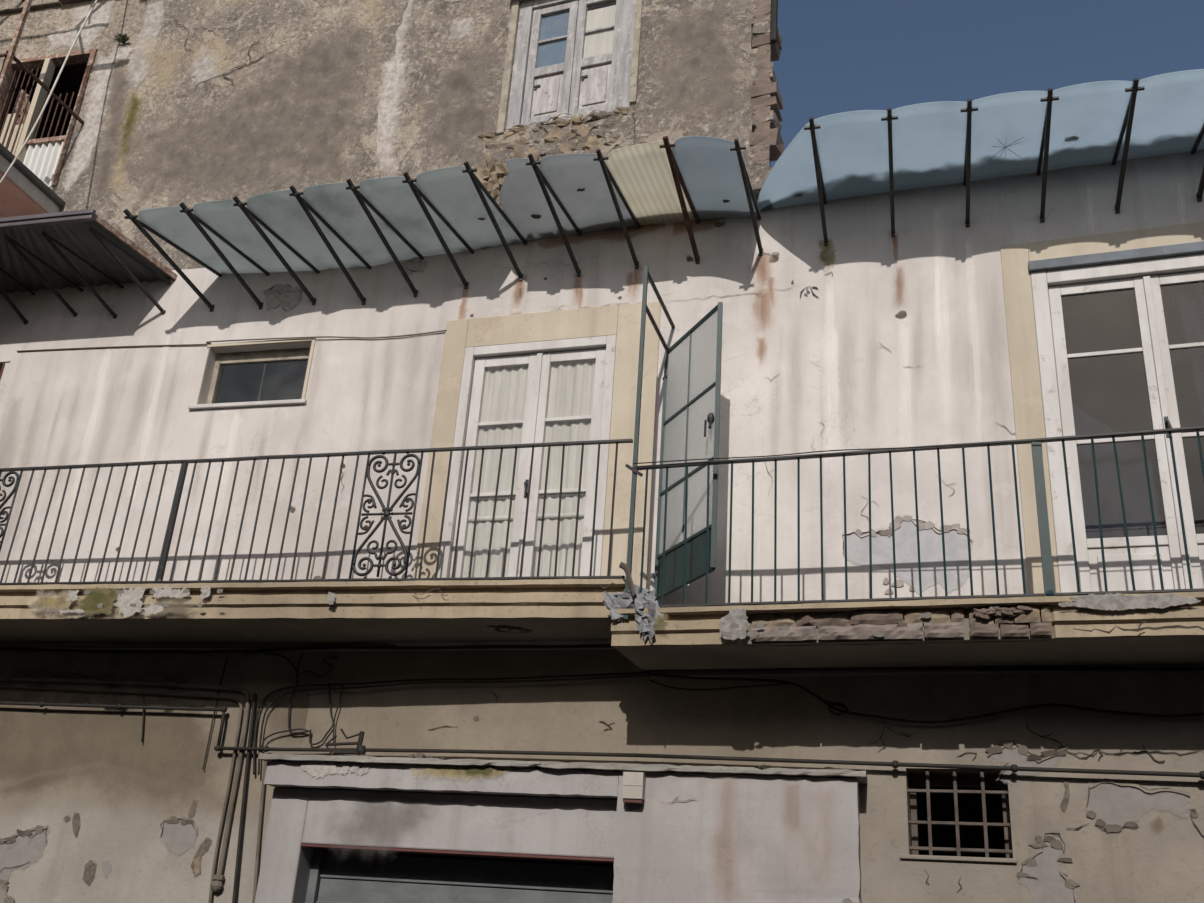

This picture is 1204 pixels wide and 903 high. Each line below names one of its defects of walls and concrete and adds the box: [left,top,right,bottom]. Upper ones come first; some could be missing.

water stain [96,59,141,196]
rust [753,253,776,359]
rust [892,235,903,304]
peeling [842,515,973,594]
spalling [59,586,223,618]
spalling [719,593,1200,642]
peeling [985,738,1071,785]
crack [1026,723,1103,760]
crack [1133,745,1165,763]
peeling [0,825,50,903]
peeling [160,800,212,876]
peeling [1017,778,1198,903]